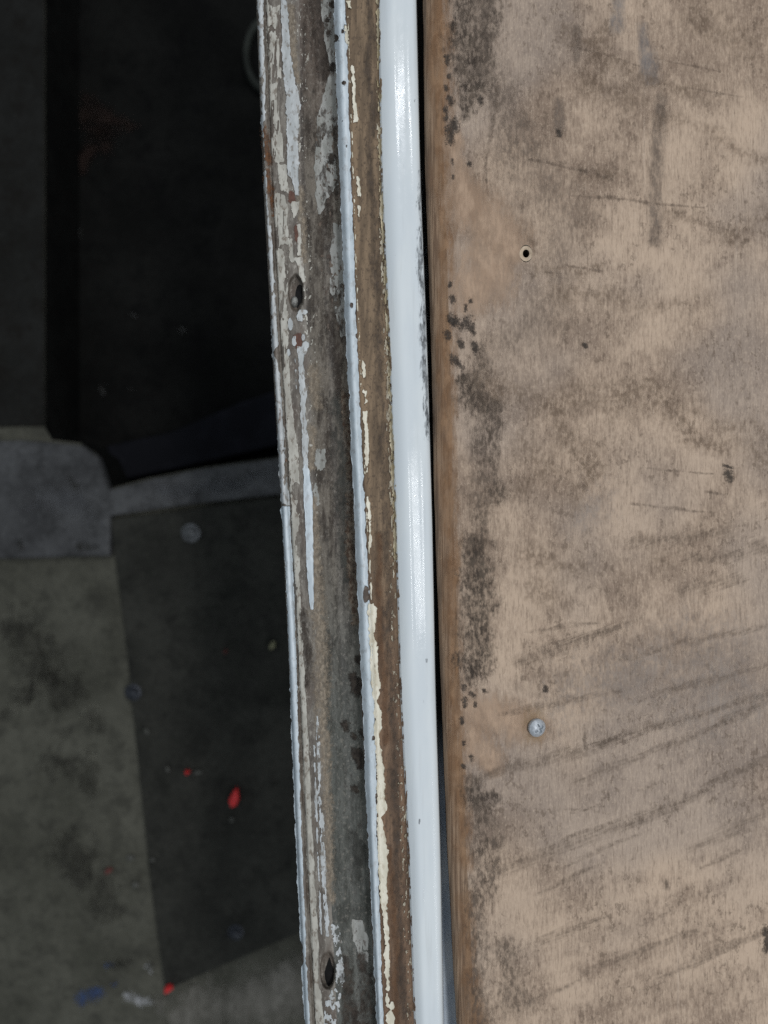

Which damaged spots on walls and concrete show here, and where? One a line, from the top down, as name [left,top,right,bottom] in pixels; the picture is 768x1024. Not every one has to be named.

peeling [257,0,416,1024]
leakage [430,0,504,1024]